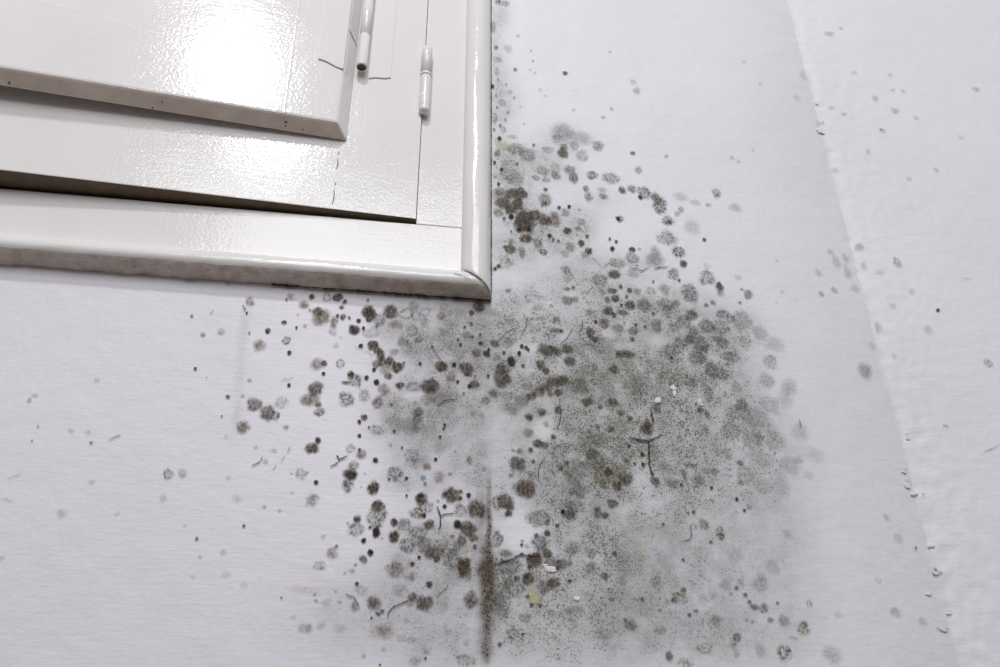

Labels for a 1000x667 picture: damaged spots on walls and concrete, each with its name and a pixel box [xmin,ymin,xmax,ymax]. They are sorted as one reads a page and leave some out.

damp [248,399,288,428]
damp [300,80,788,667]